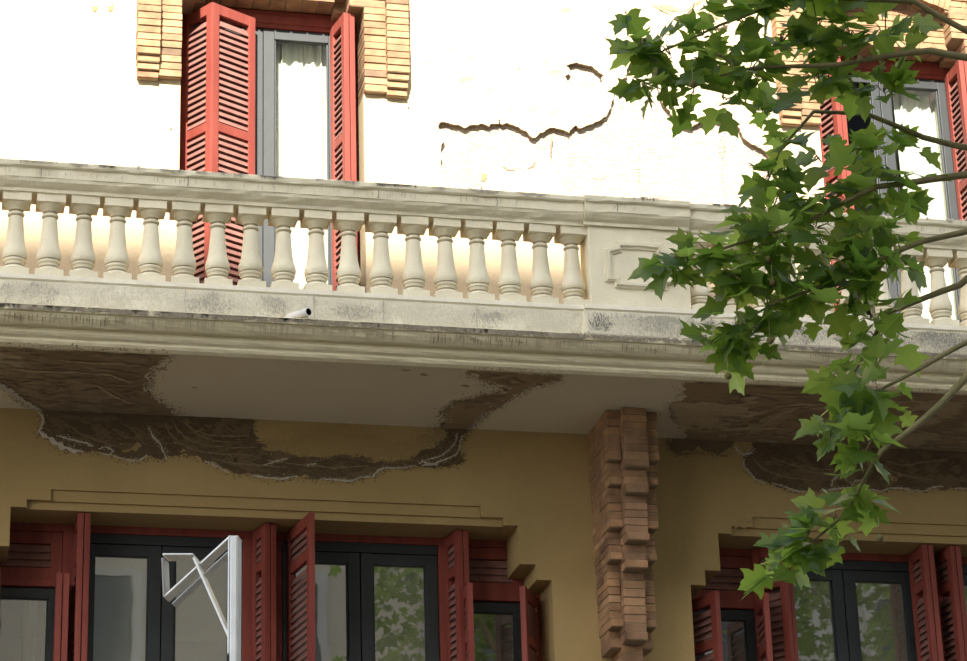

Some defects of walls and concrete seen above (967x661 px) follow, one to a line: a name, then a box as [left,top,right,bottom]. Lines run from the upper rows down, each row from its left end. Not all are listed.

flaking render [565,62,604,88]
flaking render [438,66,780,208]